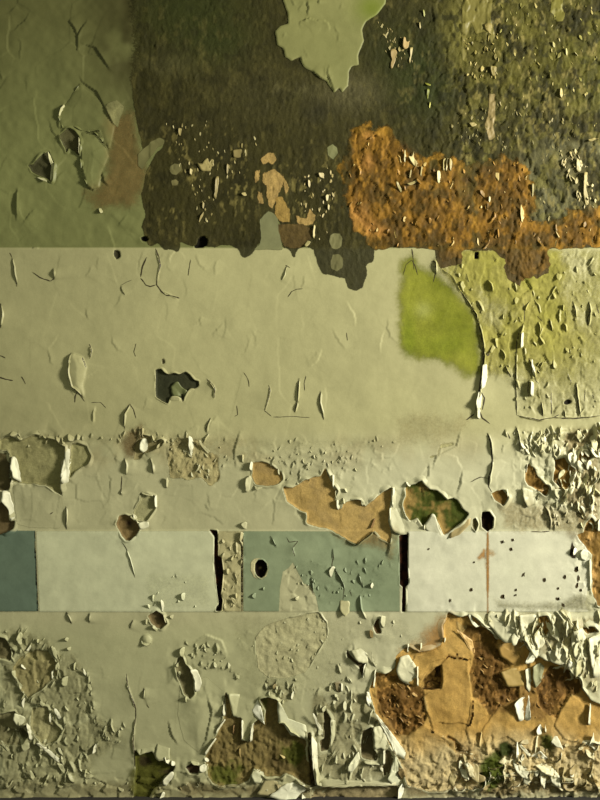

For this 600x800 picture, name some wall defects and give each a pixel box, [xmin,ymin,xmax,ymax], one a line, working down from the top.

peeling [28,125,84,185]
damp [95,0,600,291]
corrosion [338,121,600,281]
crack [121,248,179,299]
peeling [154,359,200,405]
peeling [476,364,488,419]
peeling [490,266,578,409]
peeling [0,427,220,537]
peeling [113,422,600,800]
peeling [0,627,125,791]